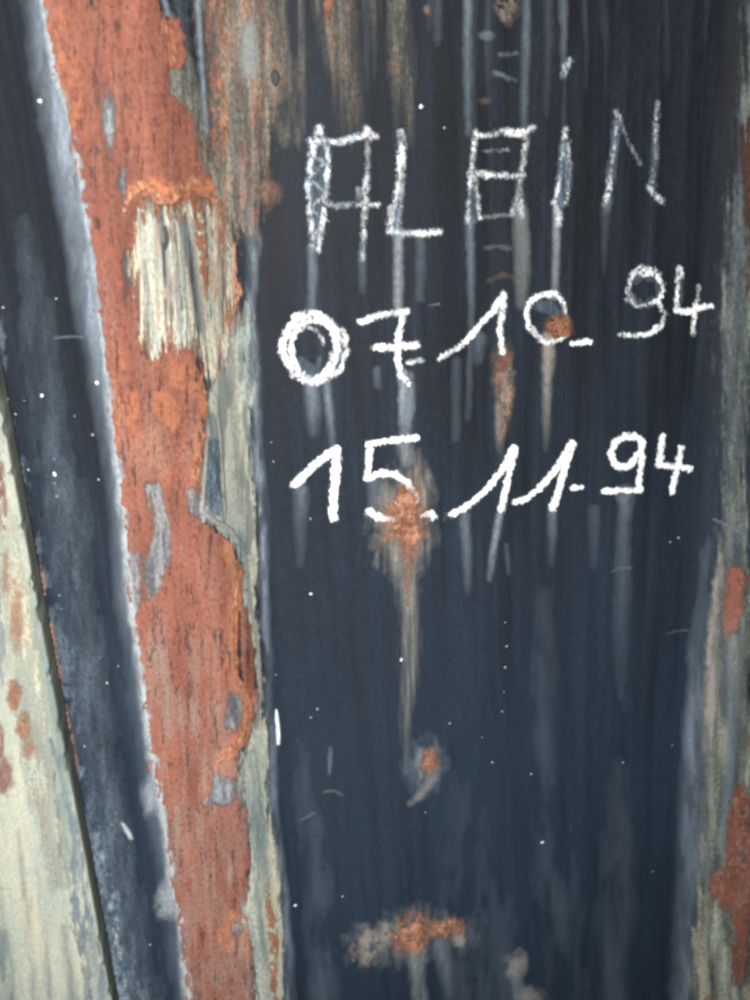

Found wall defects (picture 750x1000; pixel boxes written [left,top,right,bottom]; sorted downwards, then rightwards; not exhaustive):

peeling [100,94,114,149]
corrosion [542,316,571,401]
corrosion [0,466,70,888]
corrosion [41,0,283,1000]
peeling [127,189,284,1000]
corrosion [379,466,427,649]
corrosion [723,566,750,637]
corrosion [420,749,436,795]
corrosion [359,917,464,981]
corrosion [707,782,750,988]